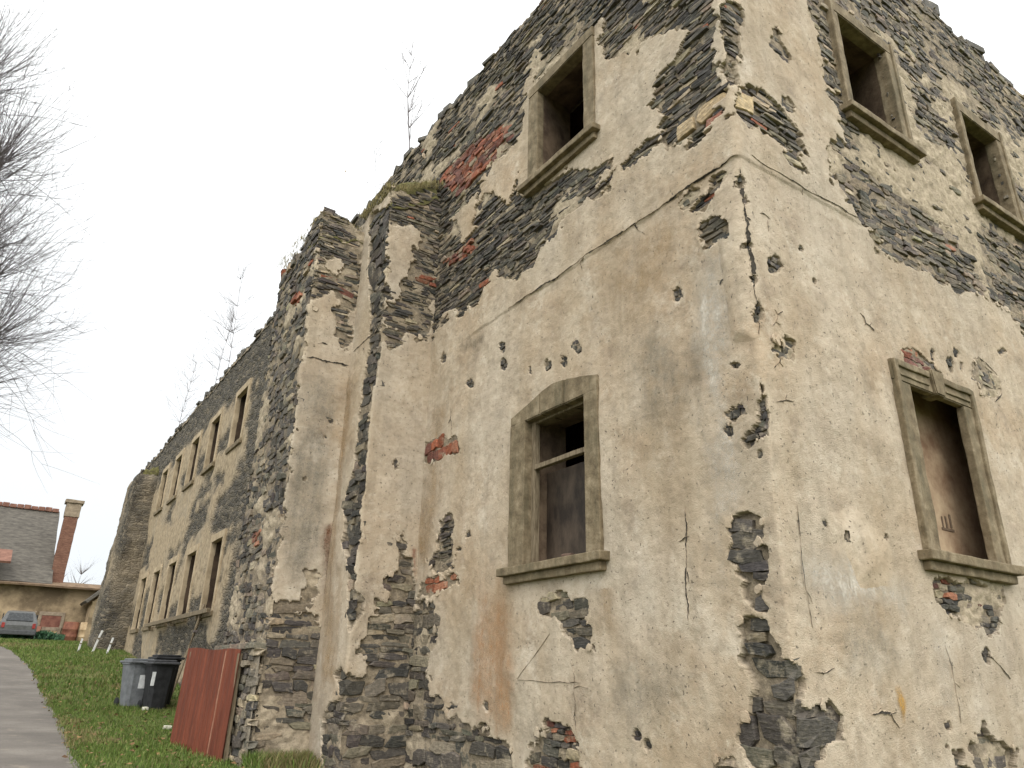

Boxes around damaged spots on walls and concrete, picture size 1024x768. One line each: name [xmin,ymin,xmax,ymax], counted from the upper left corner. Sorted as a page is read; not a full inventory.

crack [508,155,859,334]
flaking render [807,0,1024,337]
flaking render [223,0,809,768]
crack [678,506,690,618]
flaking render [713,513,847,768]
crack [797,506,813,628]
flaking render [932,579,1004,635]